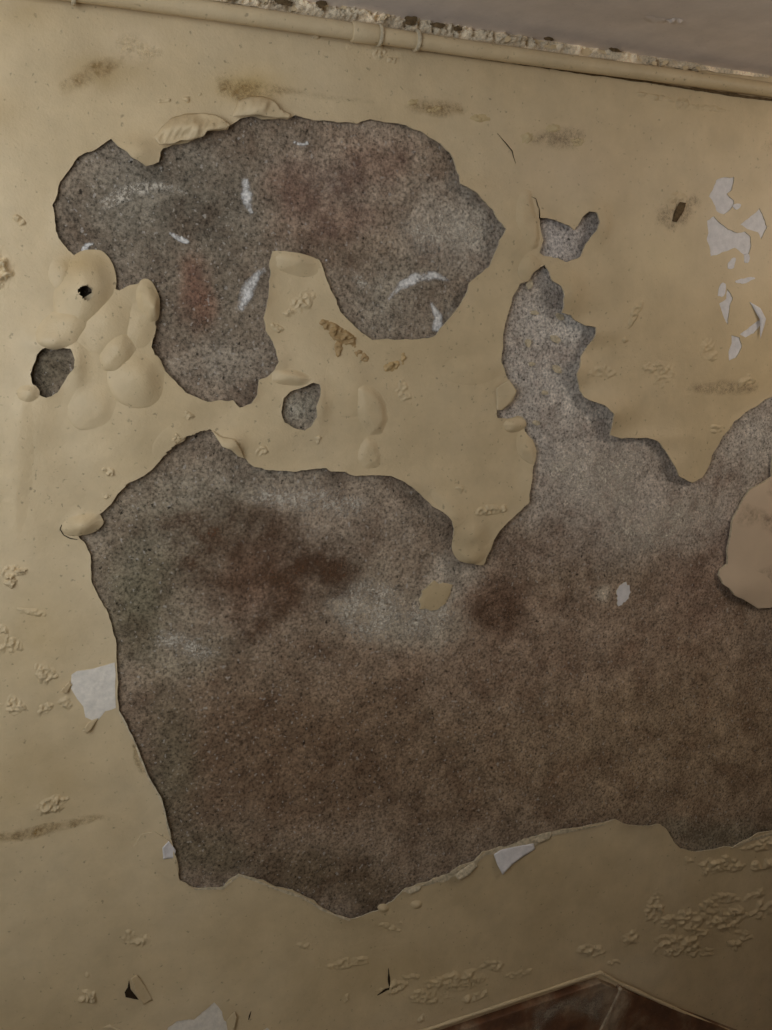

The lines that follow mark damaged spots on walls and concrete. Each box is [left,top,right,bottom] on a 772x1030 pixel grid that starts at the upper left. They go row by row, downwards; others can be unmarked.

flaking render [213,0,769,78]
spalling [52,88,505,407]
peeling [672,202,686,222]
peeling [707,177,767,323]
damp [164,512,448,638]
spalling [0,212,772,918]
peeling [167,1002,227,1030]